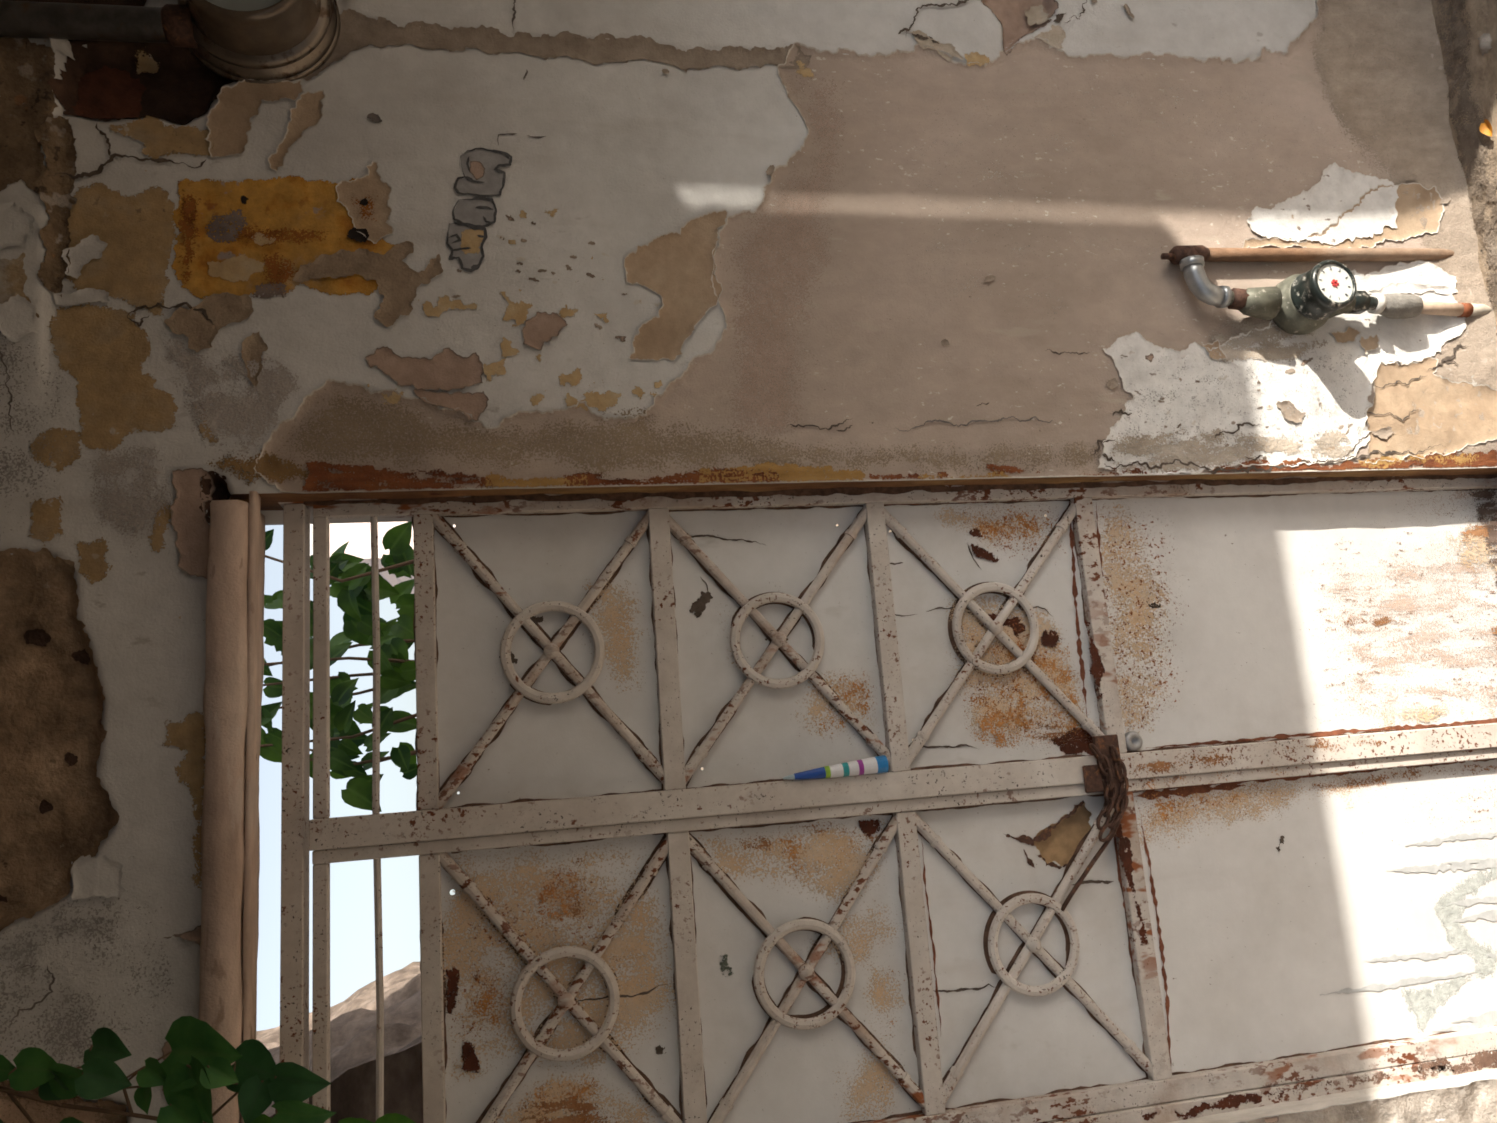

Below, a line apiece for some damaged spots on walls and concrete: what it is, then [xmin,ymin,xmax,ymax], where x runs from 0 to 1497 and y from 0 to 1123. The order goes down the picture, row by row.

crack [510,0,518,34]
flaking render [164,292,268,386]
peeling [253,0,1497,493]
rust [206,450,1040,492]
rust [1209,449,1497,473]
flaking render [0,548,120,931]
rust [934,489,1497,1063]
rust [442,836,676,1123]
rust [921,839,941,1031]